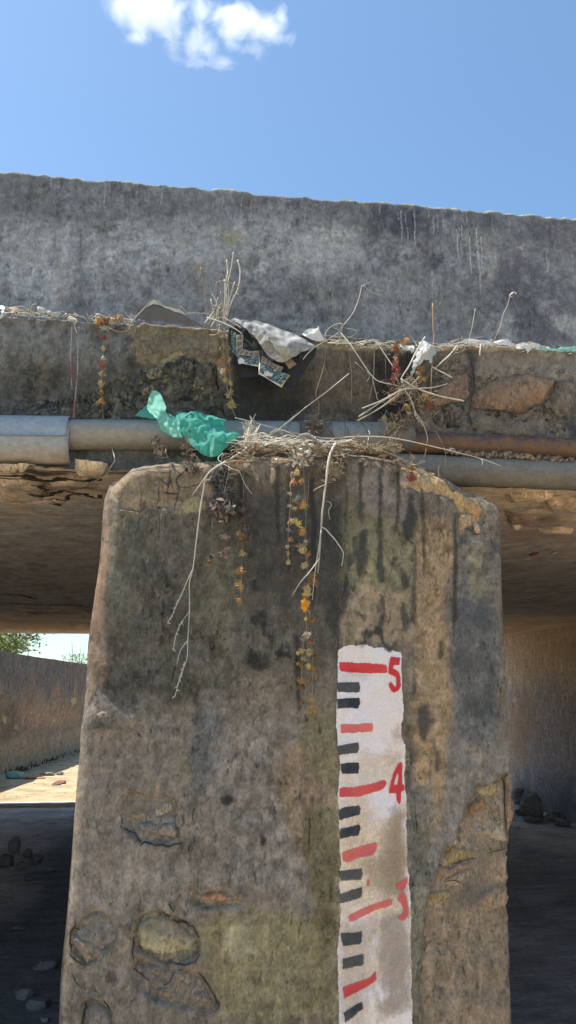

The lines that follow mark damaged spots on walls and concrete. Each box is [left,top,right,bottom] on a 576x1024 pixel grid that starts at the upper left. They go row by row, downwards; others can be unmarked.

flaking render [0,459,217,520]
water stain [223,461,426,632]
flaking render [399,466,482,534]
water stain [453,512,487,629]
water stain [246,611,308,722]
water stain [358,595,395,652]
flaking render [120,779,180,841]
flaking render [72,911,115,962]
flaking render [131,911,215,1010]
flaking render [420,773,514,1024]